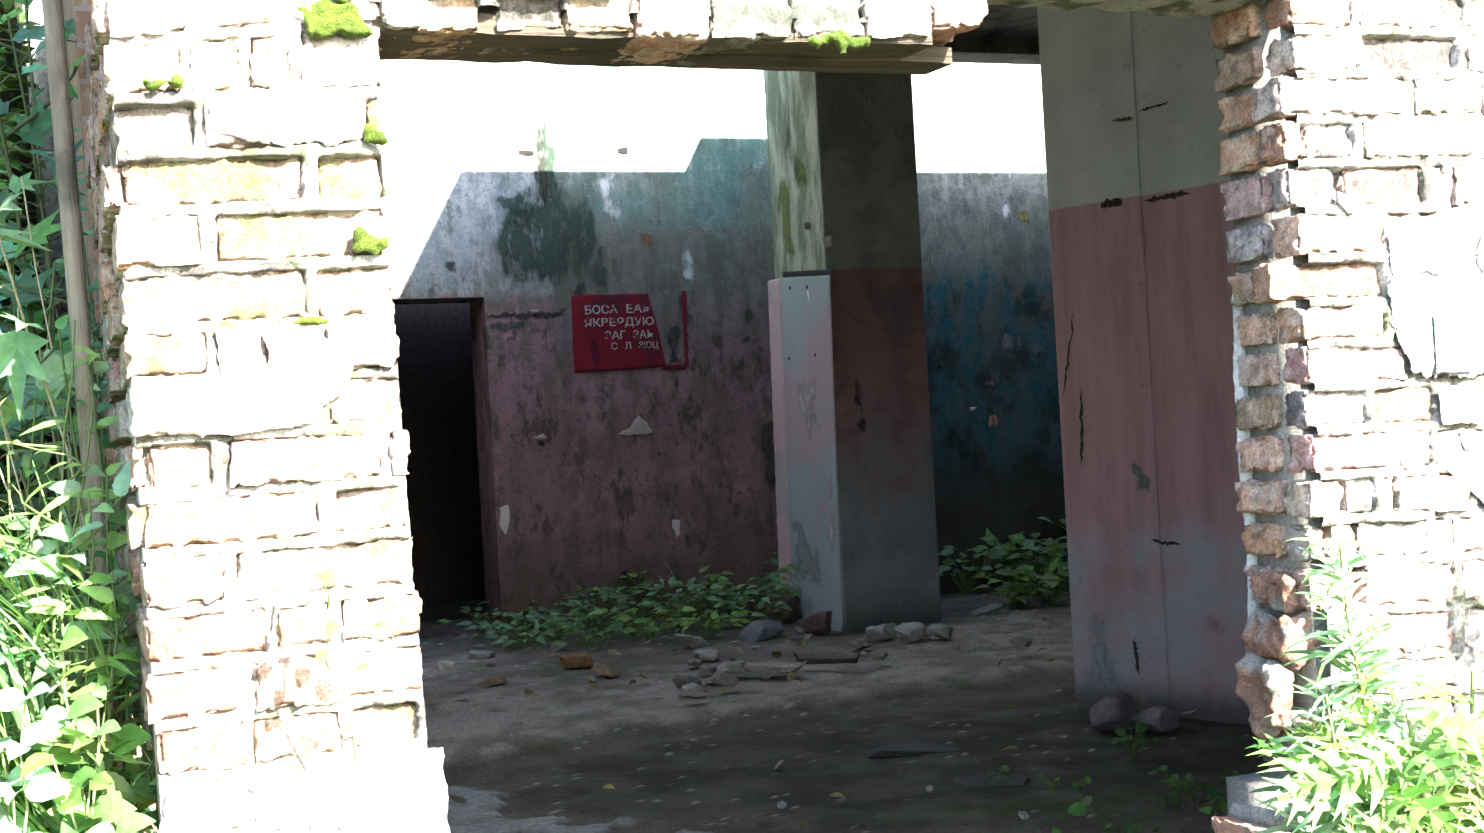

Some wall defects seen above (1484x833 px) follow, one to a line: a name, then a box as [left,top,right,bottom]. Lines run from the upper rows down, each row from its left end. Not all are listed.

water stain [496,104,595,282]
peeling [599,173,621,219]
flaking render [215,324,322,374]
crack [1063,311,1084,466]
flaking render [191,409,323,435]